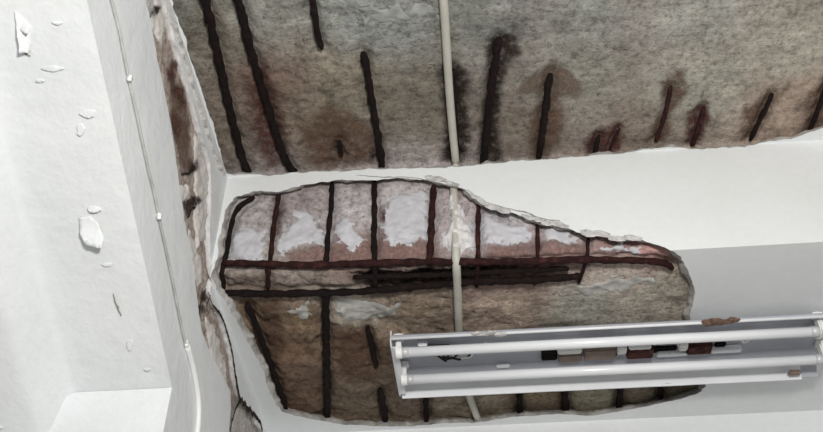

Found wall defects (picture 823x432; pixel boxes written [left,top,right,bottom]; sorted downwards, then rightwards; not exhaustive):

rust [168,60,198,174]
rust [306,110,377,166]
rust [439,64,470,160]
spalling [172,0,823,176]
rust [481,33,520,162]
rust [587,123,622,154]
rust [652,73,686,138]
rust [685,102,710,143]
rust [183,196,201,218]
spalling [145,0,262,432]
rust [291,240,586,287]
spalling [211,175,706,427]